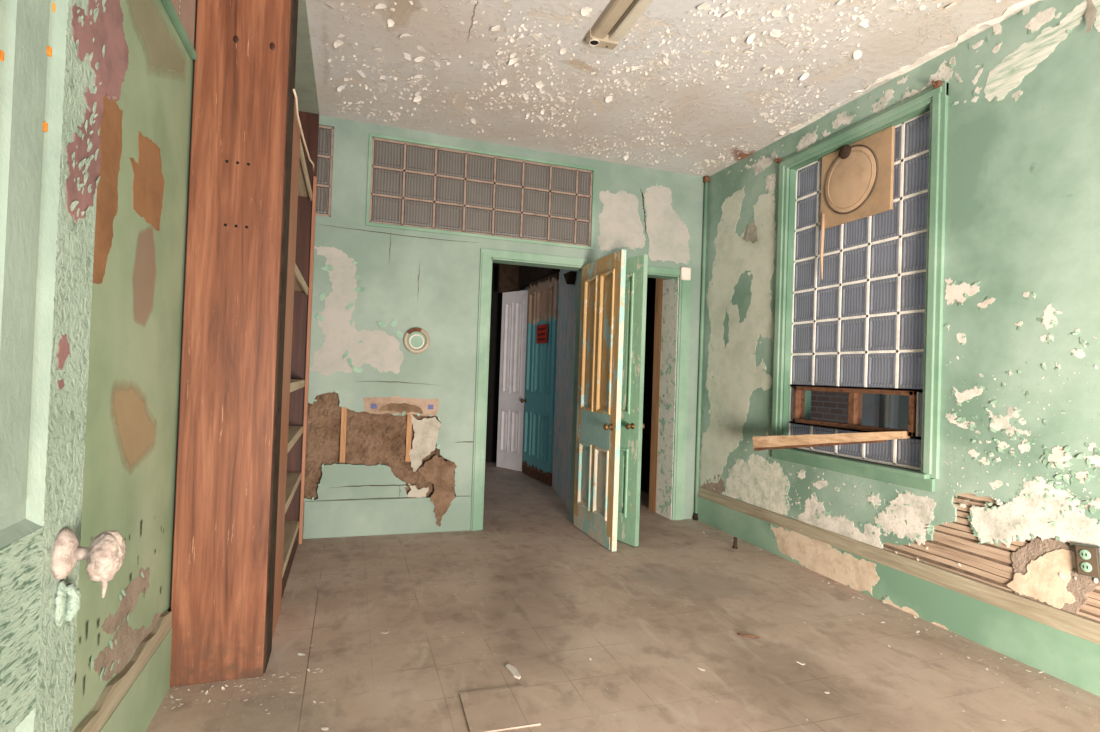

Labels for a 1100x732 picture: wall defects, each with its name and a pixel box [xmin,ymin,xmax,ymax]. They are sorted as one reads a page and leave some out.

peeling [66,0,165,284]